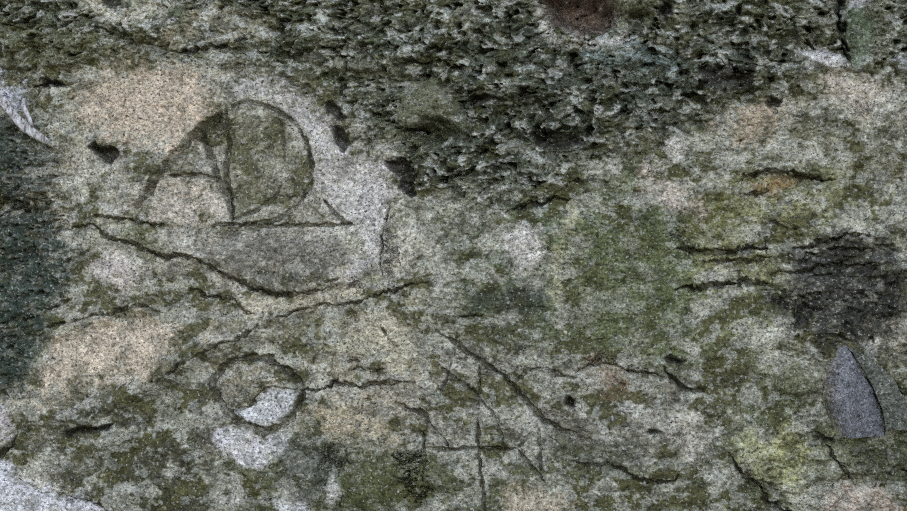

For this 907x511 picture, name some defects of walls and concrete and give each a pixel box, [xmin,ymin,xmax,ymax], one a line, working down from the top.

crack [90,213,428,376]
crack [300,359,401,392]